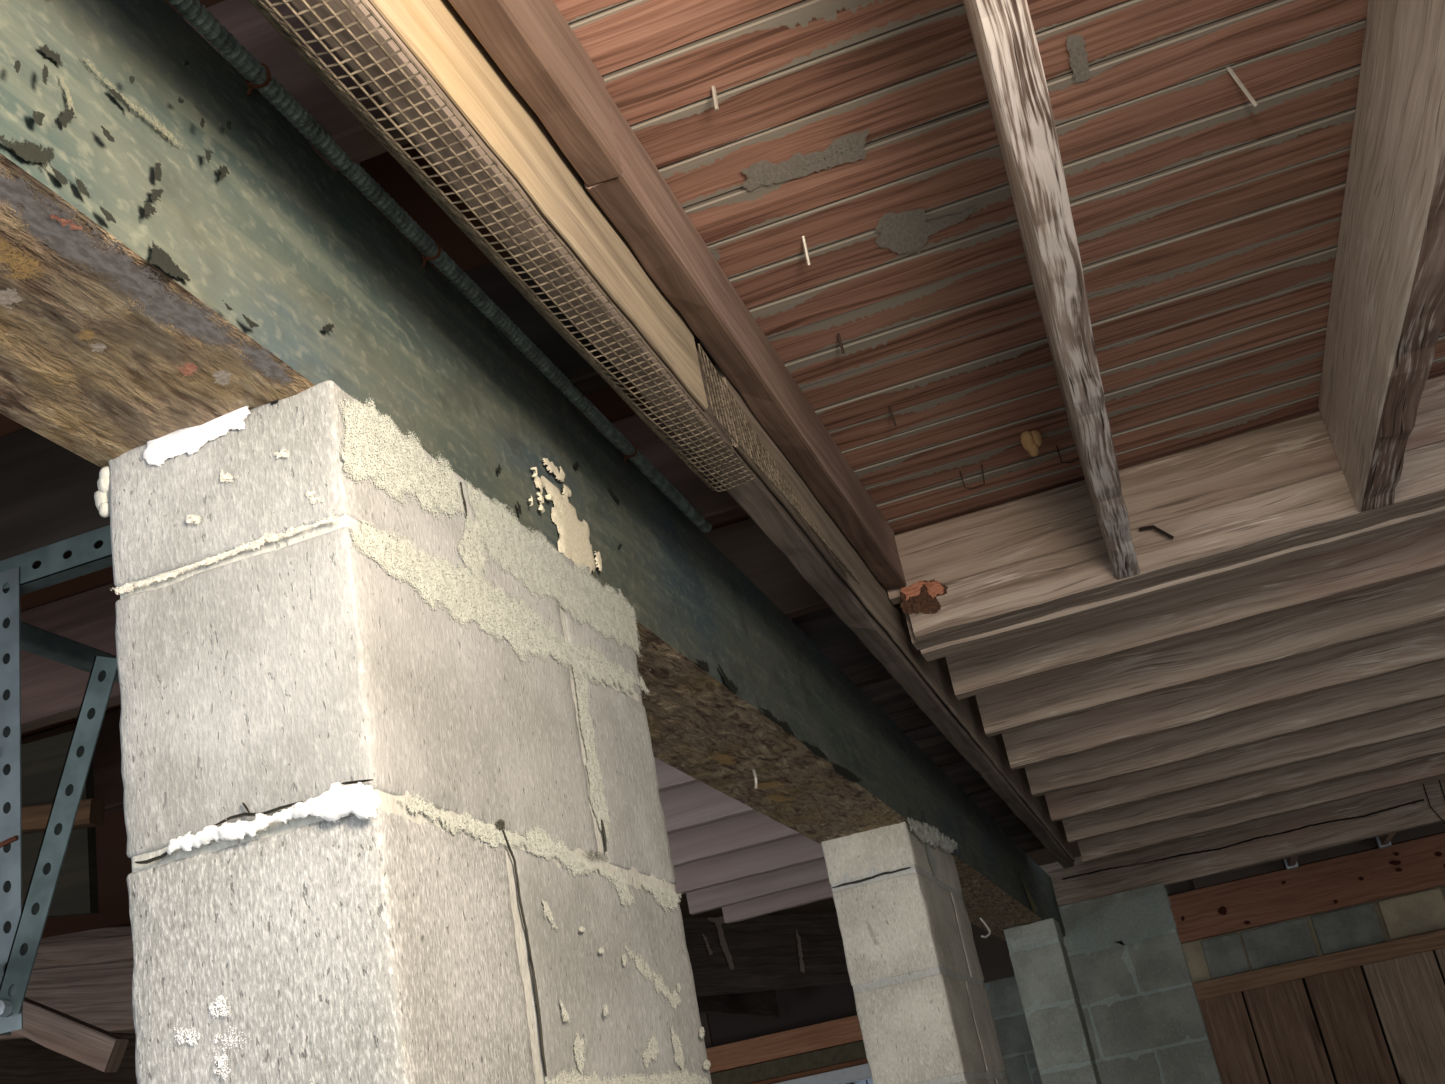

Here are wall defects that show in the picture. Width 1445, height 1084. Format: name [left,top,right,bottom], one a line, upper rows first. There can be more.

spalling [36,44,63,85]
spalling [32,107,77,128]
spalling [109,76,135,112]
peeling [0,135,298,405]
spalling [168,0,712,533]
crack [1062,799,1424,880]
crack [502,830,547,1076]